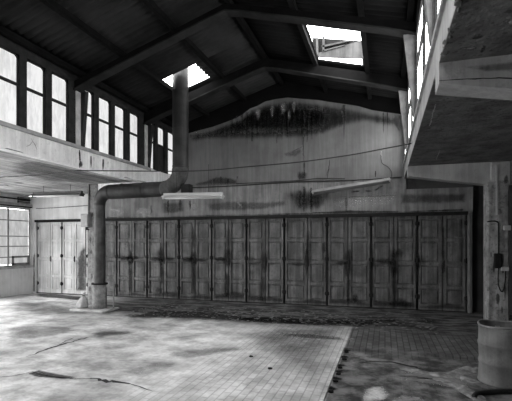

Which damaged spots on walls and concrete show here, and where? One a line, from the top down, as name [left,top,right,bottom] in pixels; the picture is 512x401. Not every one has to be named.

leakage [193,103,400,139]
leakage [286,187,398,214]
crack [26,331,128,357]
crack [2,370,152,391]